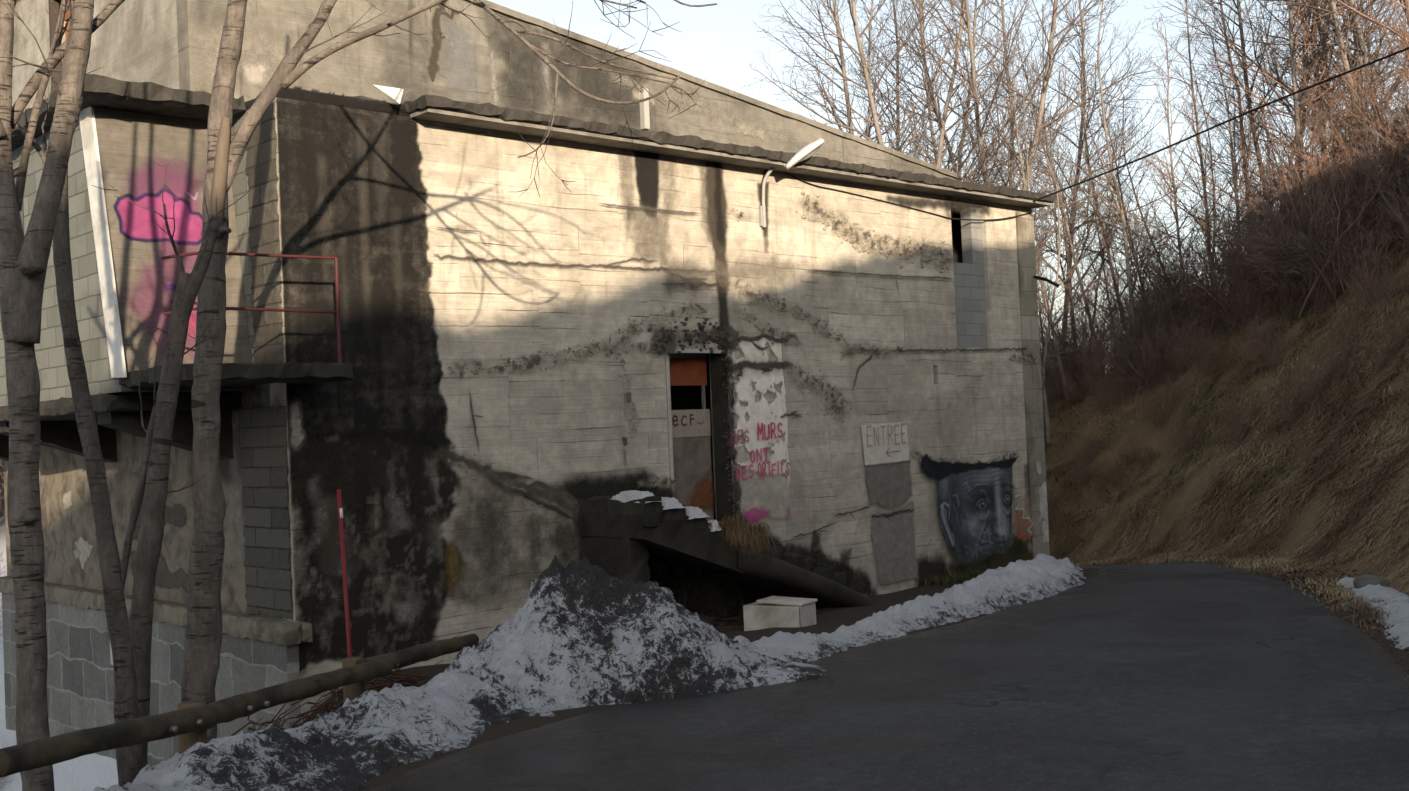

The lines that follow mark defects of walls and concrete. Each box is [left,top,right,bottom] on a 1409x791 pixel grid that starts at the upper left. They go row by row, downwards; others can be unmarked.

crack [600,203,699,219]
crack [433,227,731,289]
damp [623,150,794,347]
damp [219,87,581,673]
peeling [449,278,888,518]
peeling [63,491,73,510]
peeling [164,504,187,528]
peeling [73,536,93,570]
peeling [155,553,188,593]